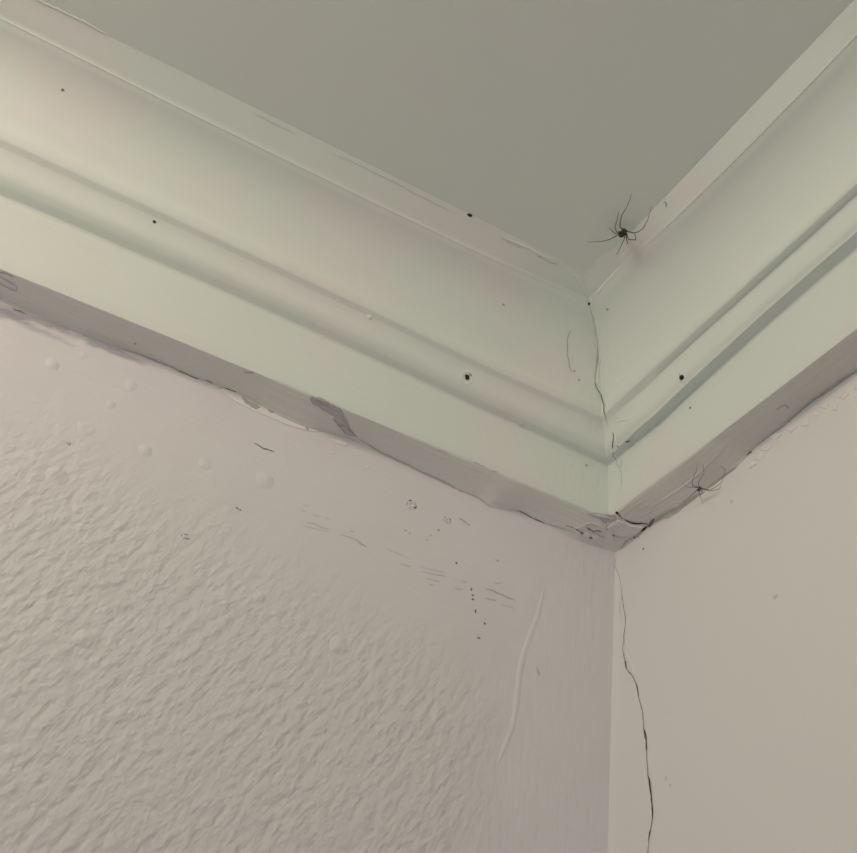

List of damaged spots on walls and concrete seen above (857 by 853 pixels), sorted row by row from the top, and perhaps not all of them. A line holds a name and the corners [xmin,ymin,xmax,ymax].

peeling [311,396,356,436]
crack [591,312,622,485]
flaking render [570,513,643,540]
crack [606,370,857,853]